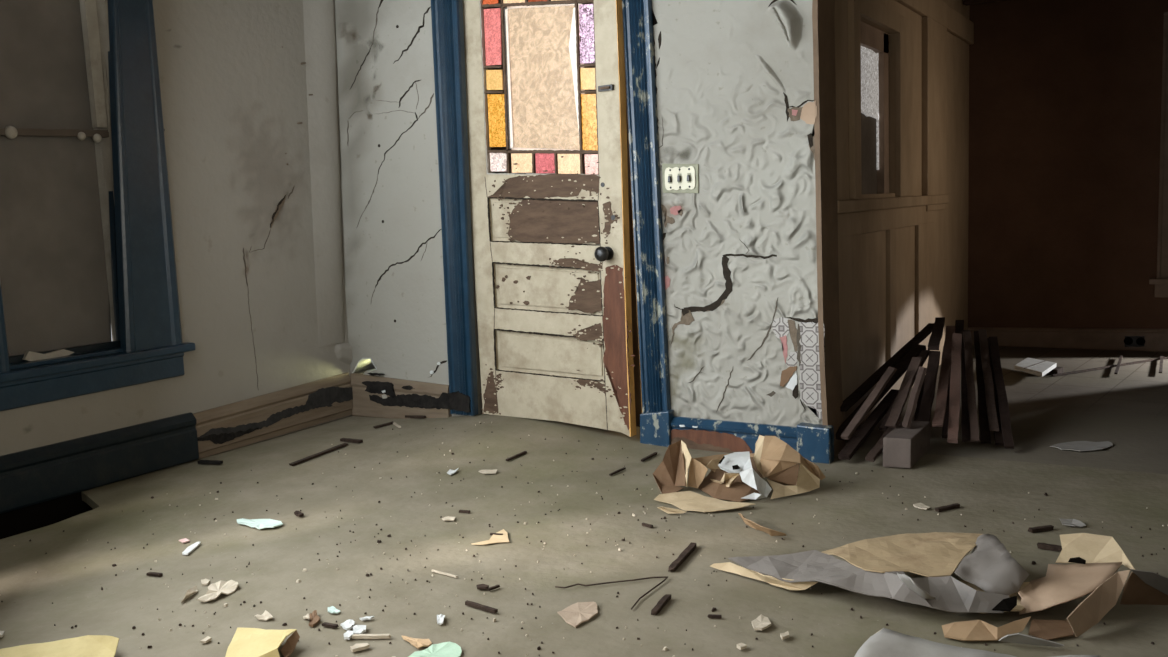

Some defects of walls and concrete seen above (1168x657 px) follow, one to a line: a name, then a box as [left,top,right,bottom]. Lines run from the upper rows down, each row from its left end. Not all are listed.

crack [347,0,434,227]
flaking render [788,101,817,160]
crack [243,185,295,386]
crack [371,229,442,302]
peeling [488,162,635,430]
crack [674,240,777,312]
crack [430,360,447,377]